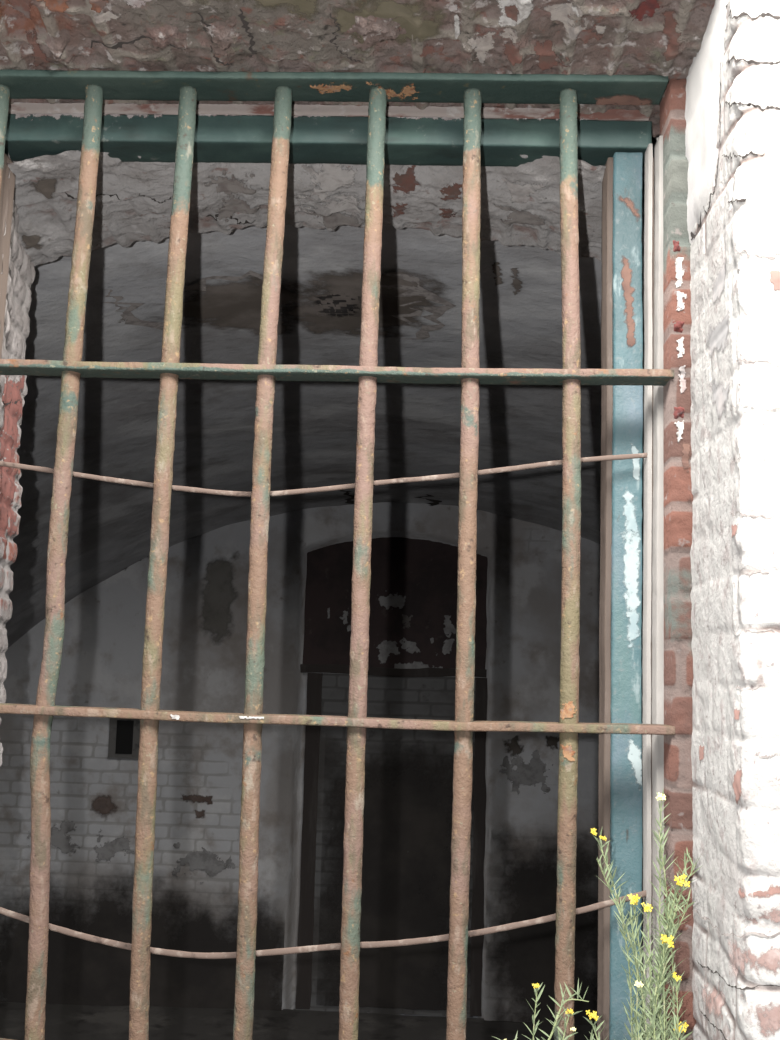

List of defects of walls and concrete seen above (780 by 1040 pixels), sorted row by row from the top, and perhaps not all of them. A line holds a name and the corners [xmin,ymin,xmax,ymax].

peeling [448,0,606,75]
crack [728,9,780,20]
corrosion [310,84,353,94]
crack [690,55,780,240]
corrosion [621,257,636,347]
peeling [675,257,687,311]
peeling [676,337,687,393]
peeling [674,420,684,442]
water stain [201,556,237,642]
corrosion [560,701,577,720]
corrosion [182,795,213,818]
peeling [738,885,780,924]